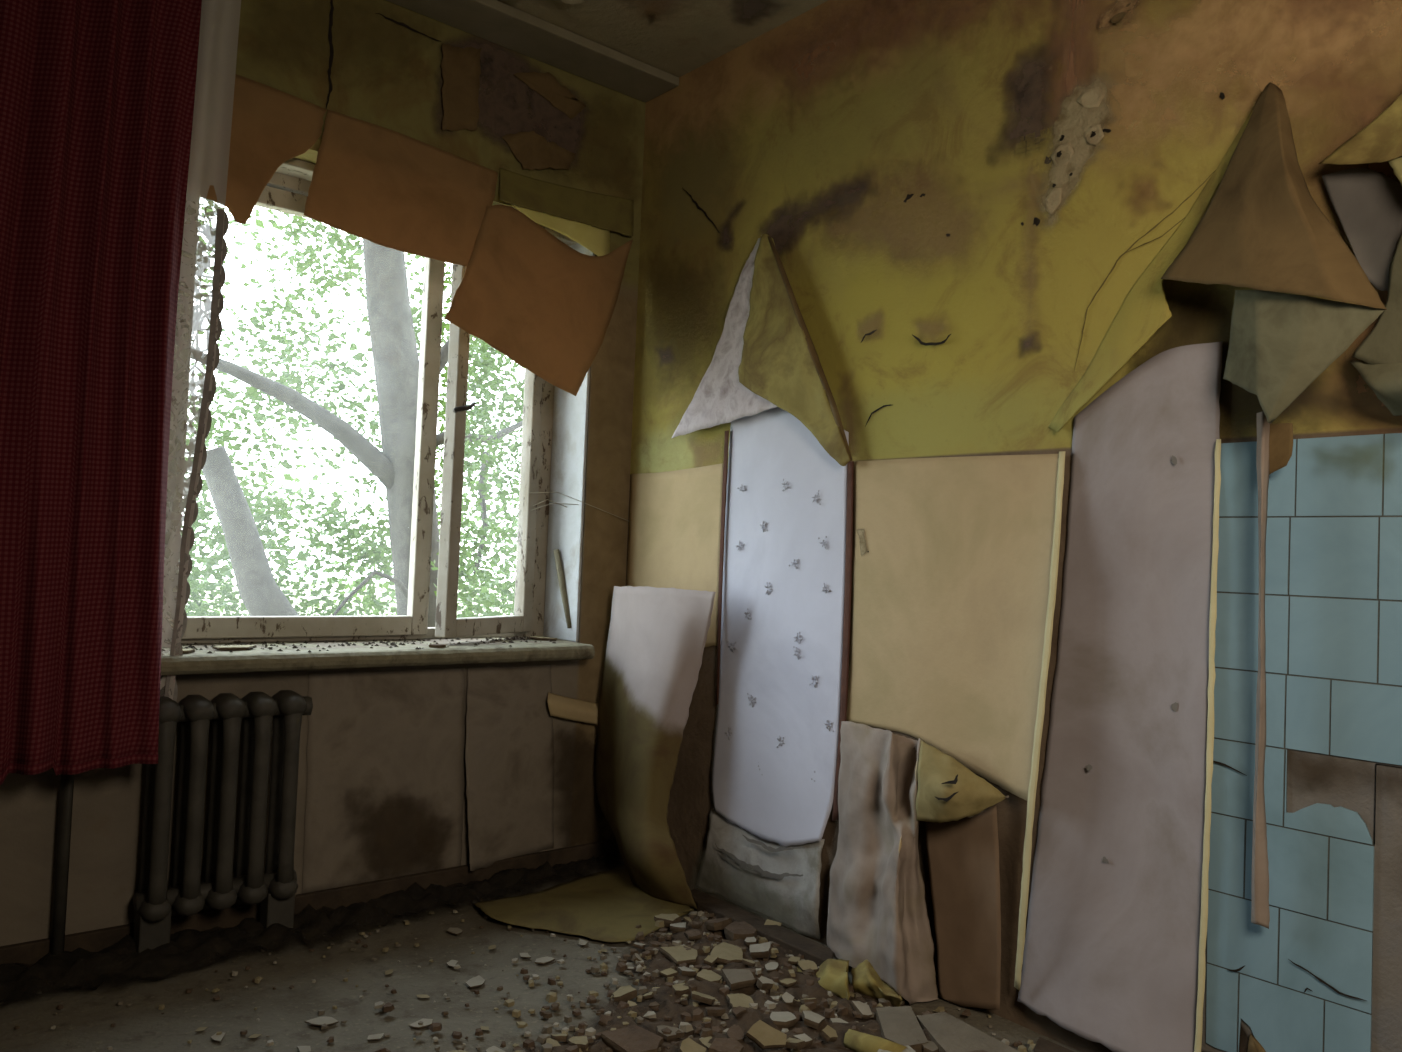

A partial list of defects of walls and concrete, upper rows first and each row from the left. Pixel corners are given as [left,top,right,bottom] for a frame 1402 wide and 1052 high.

water stain [1000,49,1056,149]
spalling [1021,39,1112,226]
water stain [1112,0,1391,127]
peeling [206,74,633,396]
water stain [761,180,965,255]
peeling [1287,749,1402,1052]
peeling [1201,938,1266,1052]